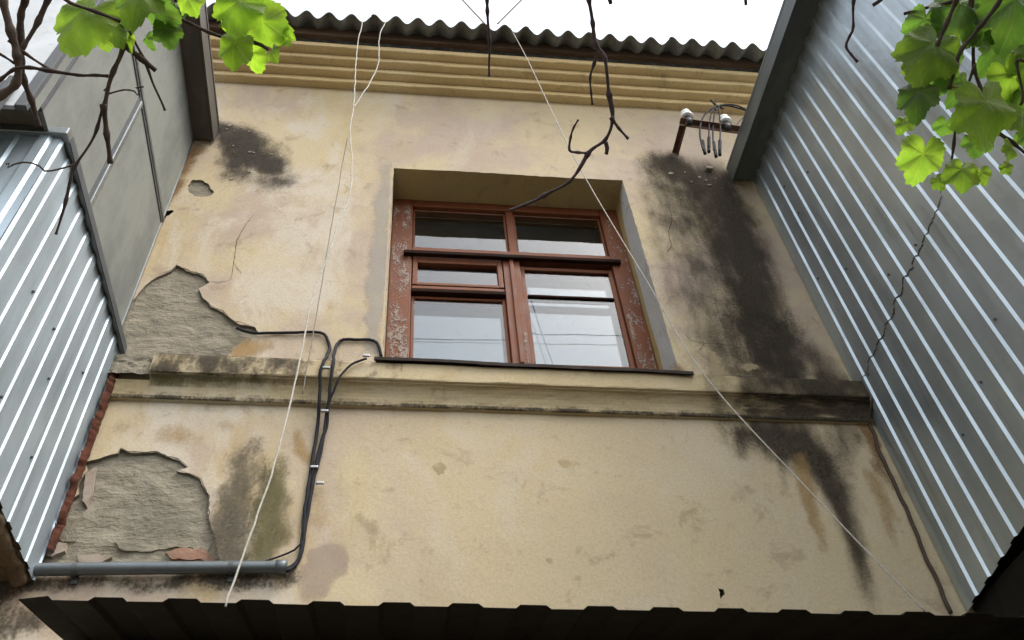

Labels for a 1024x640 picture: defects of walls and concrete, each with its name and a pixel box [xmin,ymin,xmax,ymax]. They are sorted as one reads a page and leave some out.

flaking render [188,180,214,197]
damp [215,123,290,186]
flaking render [108,266,258,374]
crack [161,218,251,351]
peeling [387,205,412,358]
peeling [606,221,656,369]
damp [647,155,875,579]
flaking render [42,449,219,563]
damp [210,446,266,561]